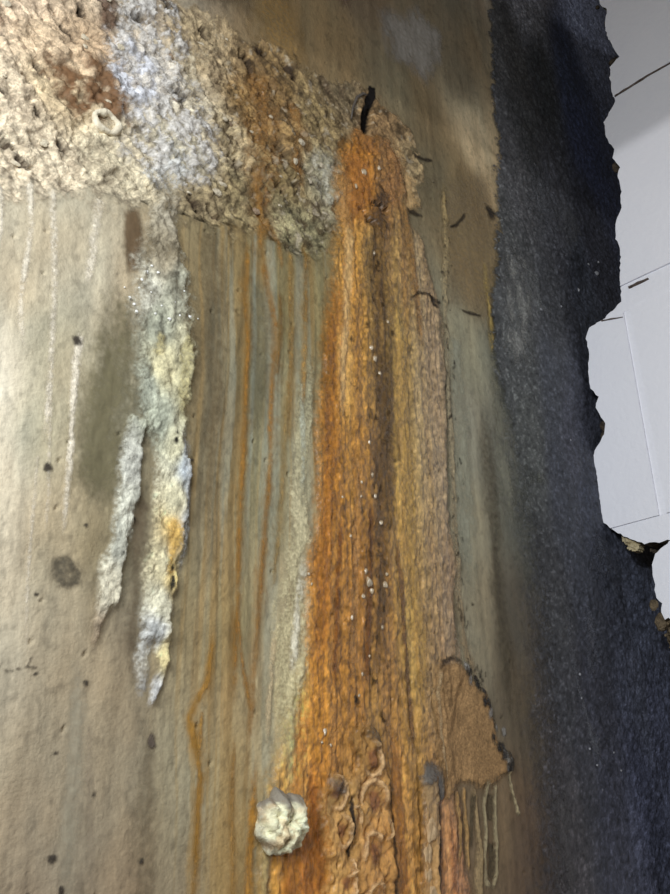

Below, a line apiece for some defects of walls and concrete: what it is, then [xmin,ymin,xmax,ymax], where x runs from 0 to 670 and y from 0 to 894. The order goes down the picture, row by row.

water stain [77,0,218,703]
rust [188,644,214,893]
spalling [0,0,434,259]
rust [229,75,470,894]
peeling [441,193,514,772]